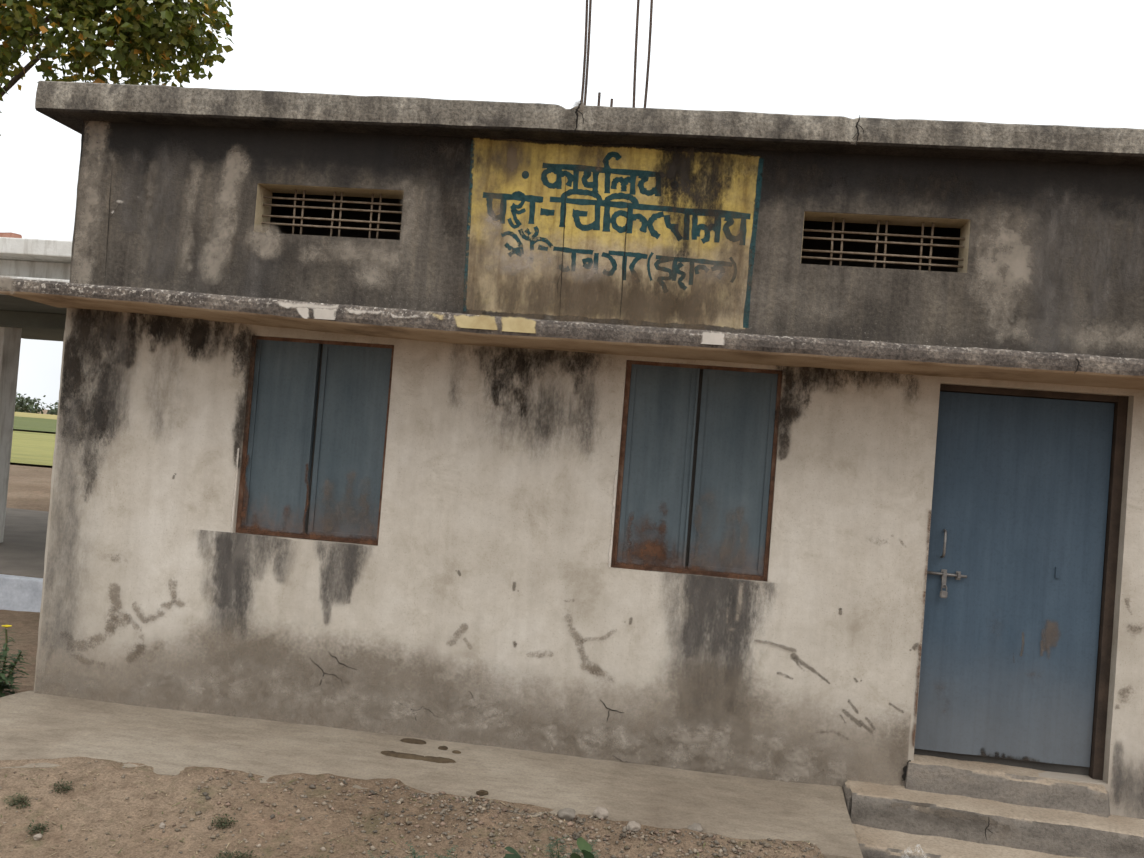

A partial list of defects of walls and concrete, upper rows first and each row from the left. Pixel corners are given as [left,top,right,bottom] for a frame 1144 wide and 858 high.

damp [59,308,258,514]
damp [475,346,594,413]
damp [777,366,913,459]
rust [612,452,772,581]
damp [201,531,287,628]
damp [322,542,359,622]
damp [40,574,794,777]